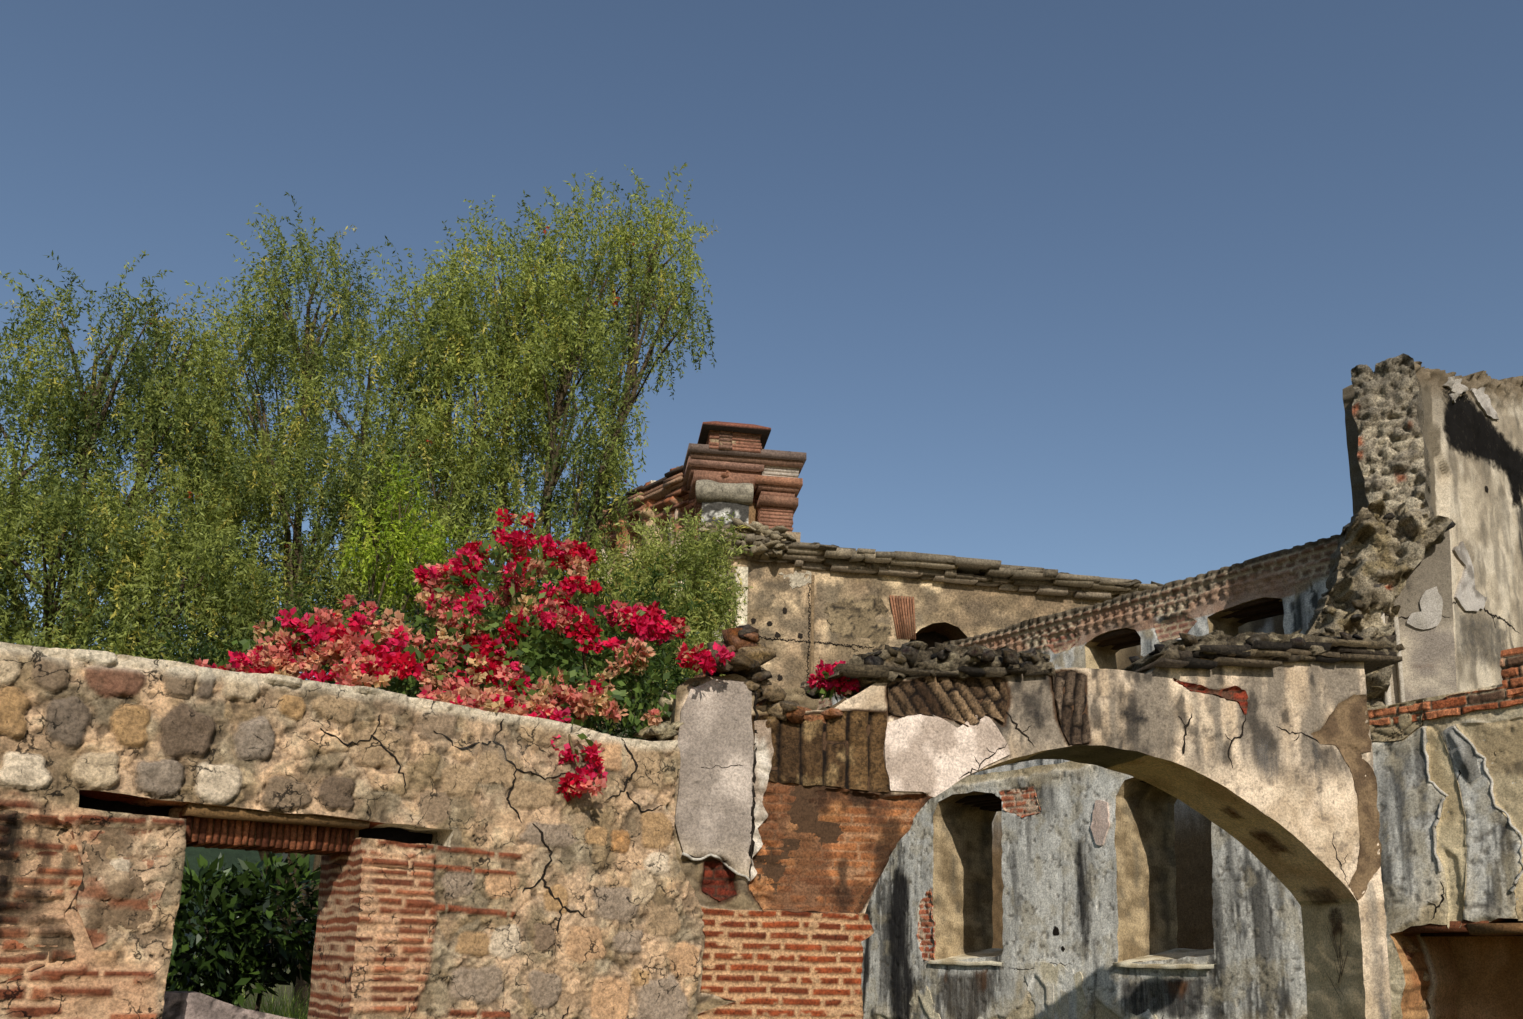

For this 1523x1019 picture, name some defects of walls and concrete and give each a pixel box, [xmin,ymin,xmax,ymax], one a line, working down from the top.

peeling [1406,541,1487,630]
crack [1178,714,1192,755]
crack [1225,716,1320,768]
crack [434,719,586,933]
spalling [682,676,1009,1019]
spalling [1311,694,1523,929]
damp [1076,841,1095,957]
peeling [1025,962,1087,1019]
peeling [1130,1009,1157,1019]